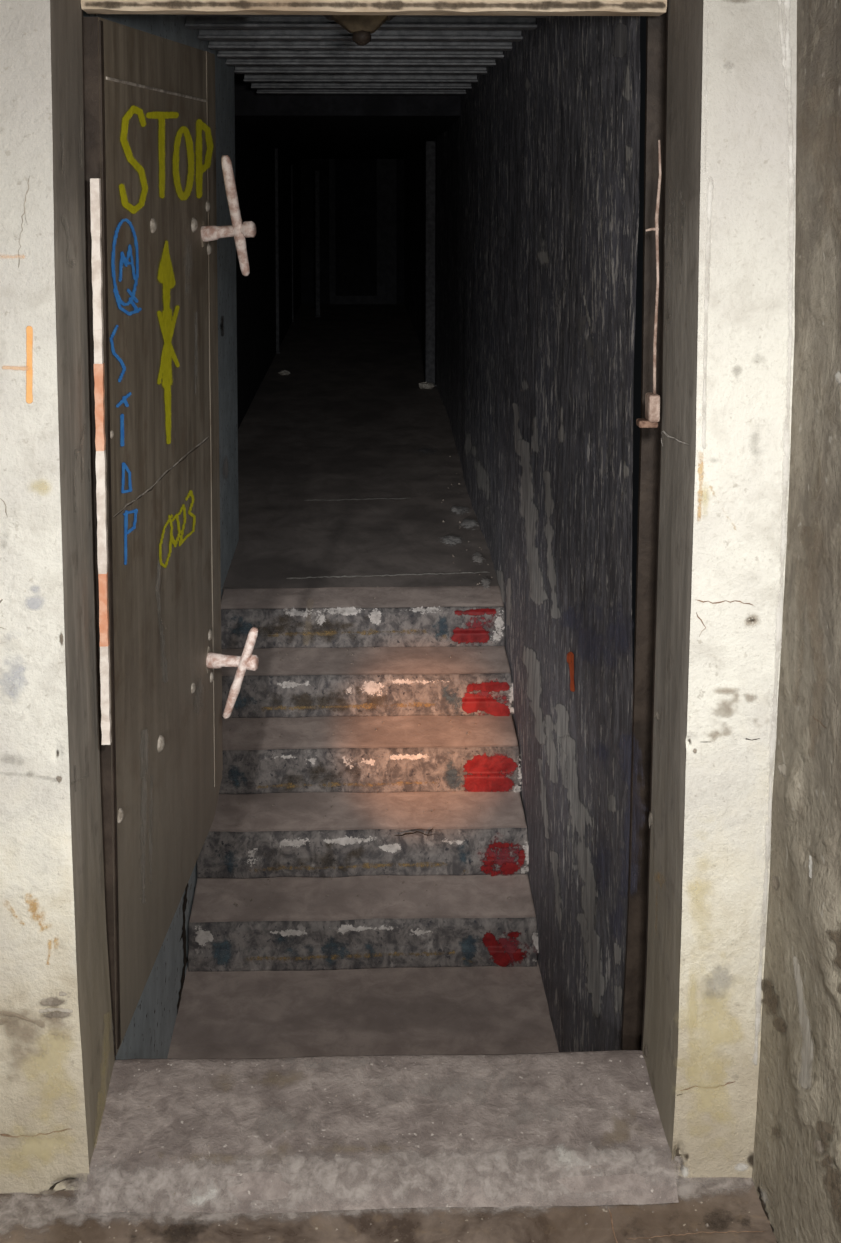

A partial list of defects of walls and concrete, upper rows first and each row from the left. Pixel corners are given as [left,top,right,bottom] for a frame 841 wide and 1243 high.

damp [86,1,666,10]
damp [754,0,794,1065]
crack [696,600,754,634]
damp [793,957,813,1088]